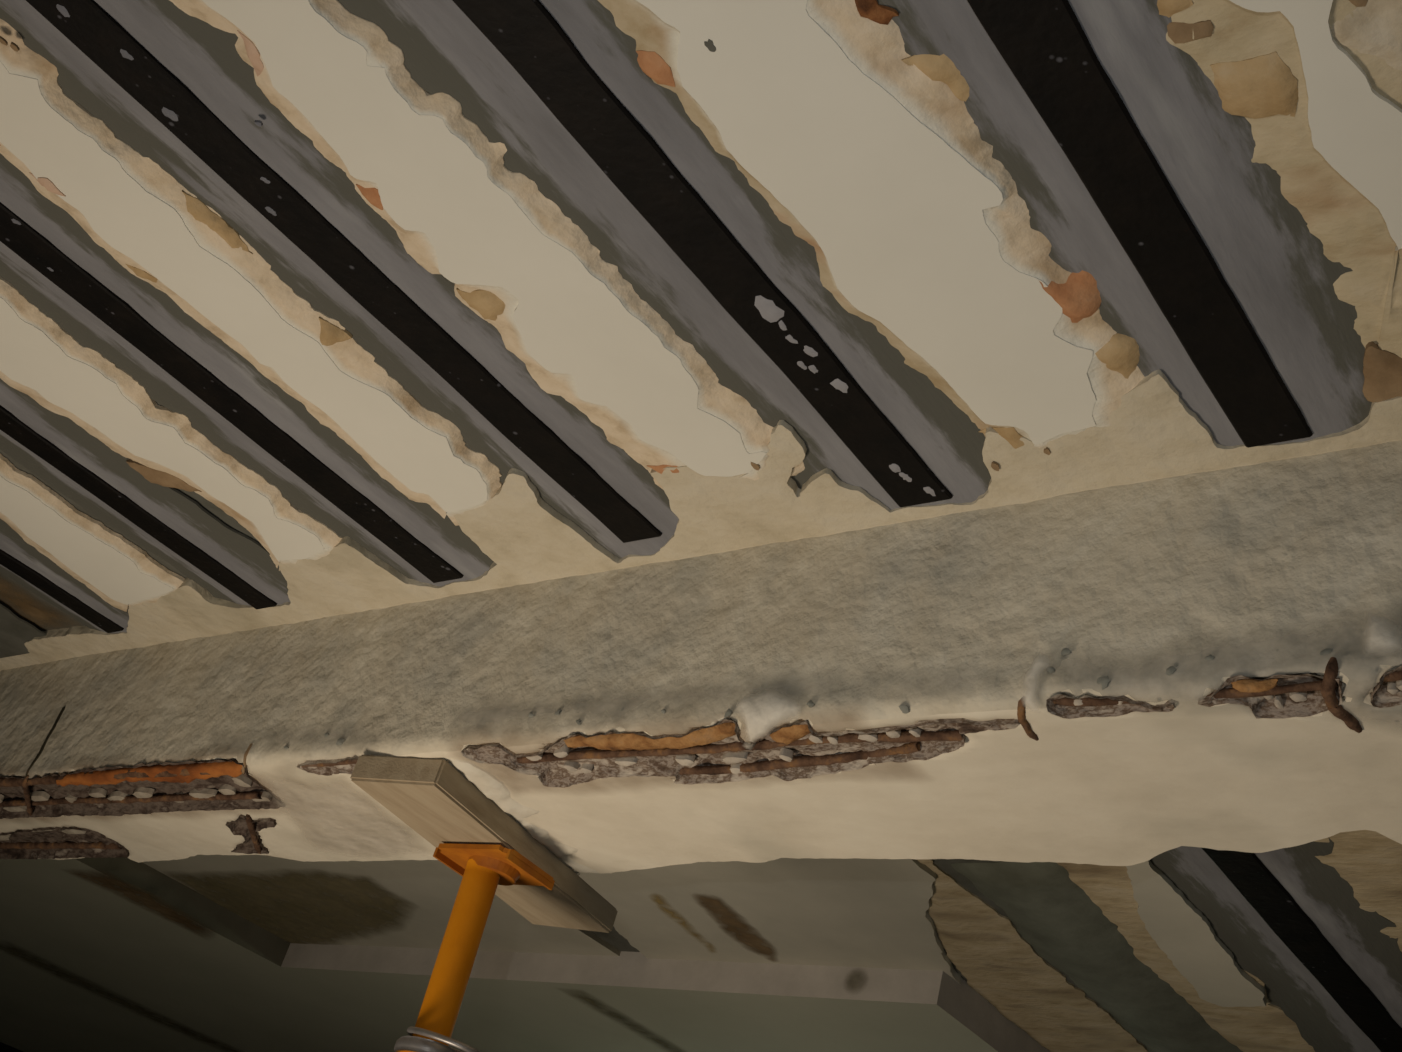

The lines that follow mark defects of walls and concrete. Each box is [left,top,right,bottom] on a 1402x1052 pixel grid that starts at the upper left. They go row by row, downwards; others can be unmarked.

flaking render [0,0,502,526]
flaking render [309,0,773,489]
flaking render [598,0,1144,455]
flaking render [1157,0,1402,402]
flaking render [0,276,343,571]
crack [26,706,65,782]
spalling [461,696,1039,788]
leakage [737,691,798,747]
spalling [1046,626,1402,733]
spalling [0,760,286,860]
leakage [698,896,774,961]
flaking render [1315,830,1402,952]